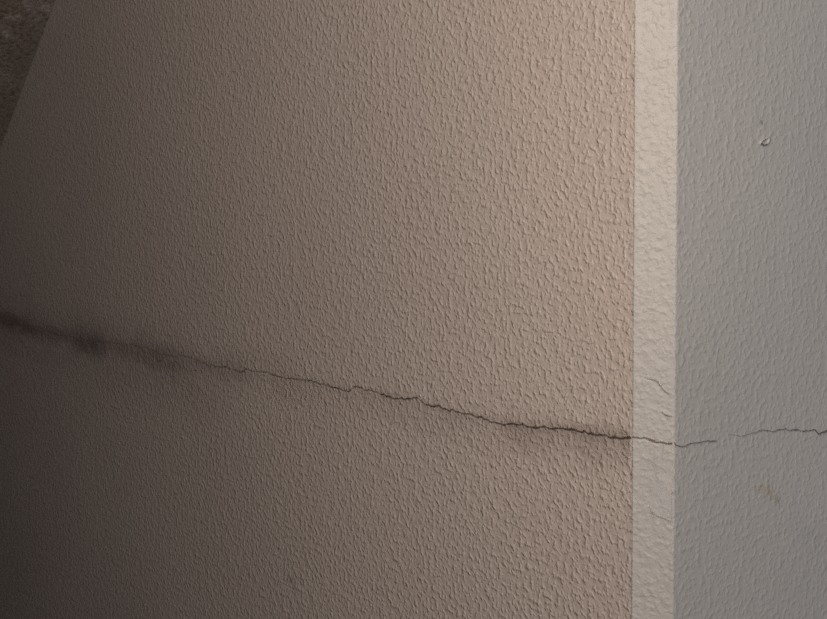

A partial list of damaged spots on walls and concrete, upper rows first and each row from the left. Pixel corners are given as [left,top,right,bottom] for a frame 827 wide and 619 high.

crack [223,366,827,447]